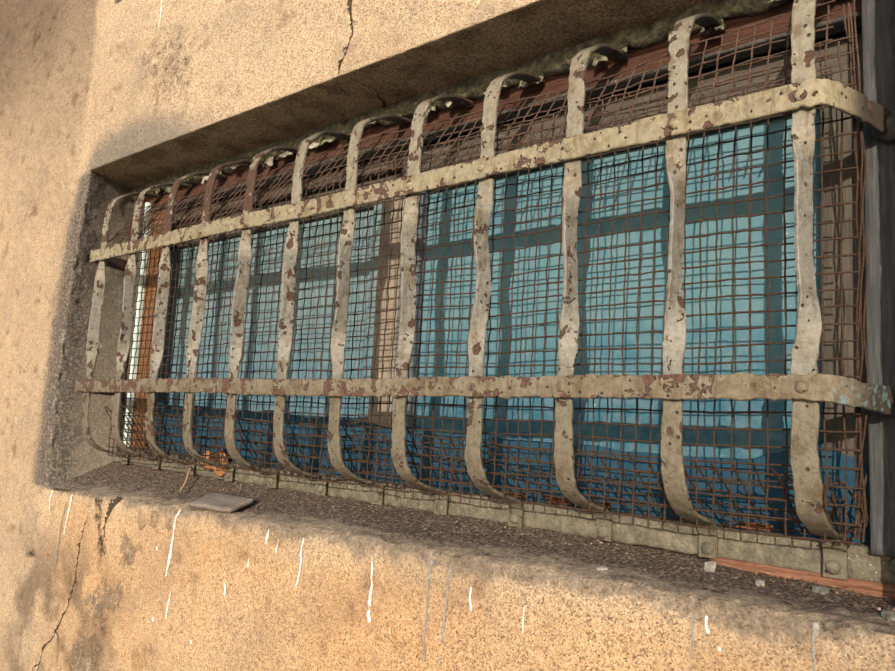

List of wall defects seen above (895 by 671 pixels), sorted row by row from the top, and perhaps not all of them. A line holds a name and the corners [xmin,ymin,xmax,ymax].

crack [338,0,386,108]
crack [32,496,121,671]
water stain [423,560,434,663]
water stain [811,621,820,671]